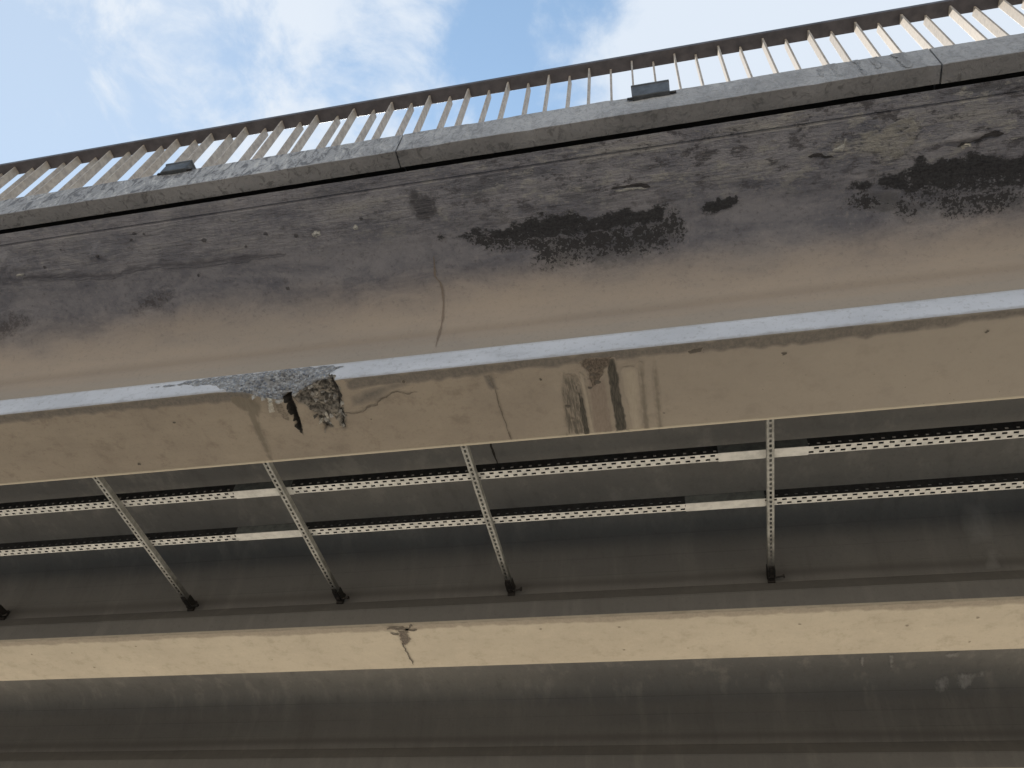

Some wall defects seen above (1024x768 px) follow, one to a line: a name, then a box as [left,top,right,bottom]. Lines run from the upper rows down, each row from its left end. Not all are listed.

crack [433,256,444,345]
leakage [342,308,1024,408]
spalling [151,365,347,461]